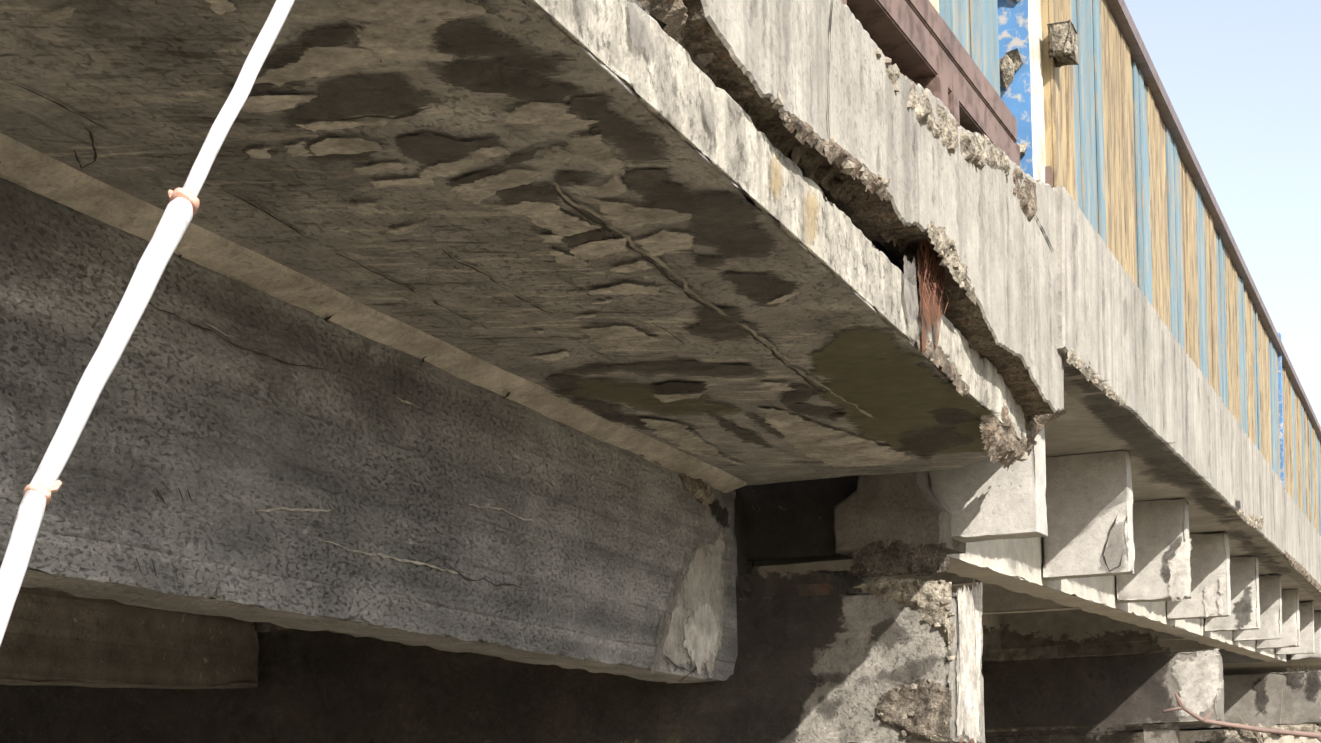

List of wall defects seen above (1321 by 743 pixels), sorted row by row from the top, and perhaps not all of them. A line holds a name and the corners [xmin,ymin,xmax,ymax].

damp [248,26,445,128]
crack [124,287,330,371]
peeling [245,102,694,350]
damp [428,0,800,342]
crack [548,185,709,308]
damp [543,358,785,448]
crack [747,333,821,425]
spalling [737,90,890,215]
damp [780,326,1010,459]
corrosion [917,239,949,351]
spalling [927,221,976,305]
spalling [850,540,983,743]